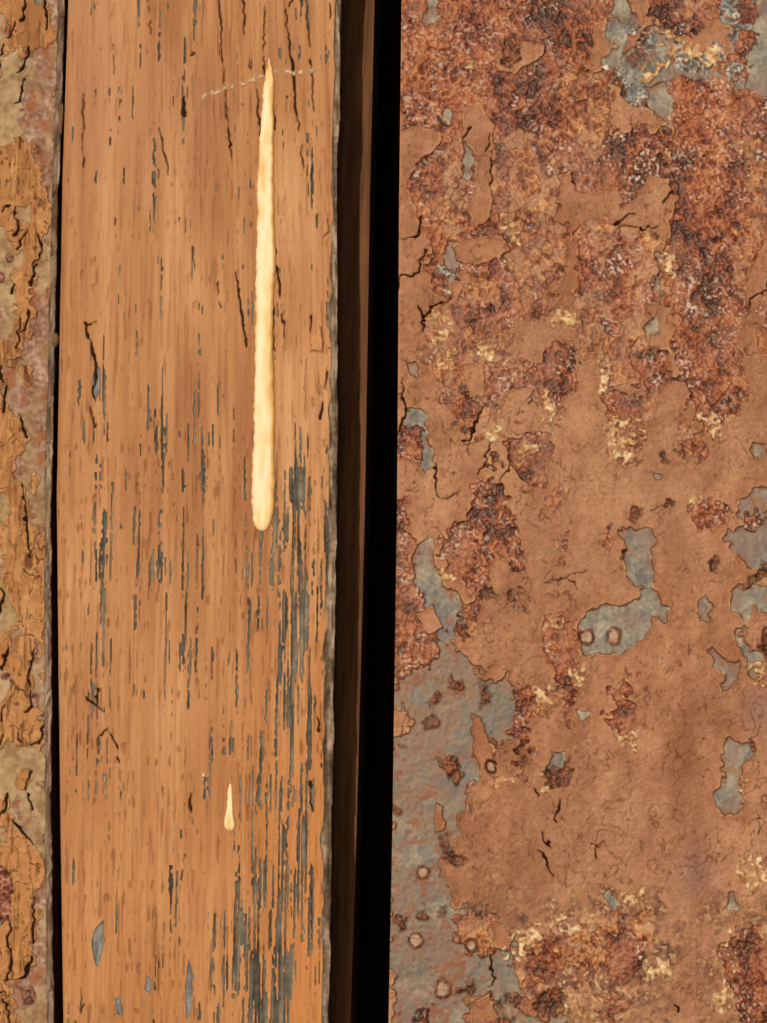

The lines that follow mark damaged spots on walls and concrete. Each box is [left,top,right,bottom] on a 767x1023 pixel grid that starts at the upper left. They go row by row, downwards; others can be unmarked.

crack [0,0,48,104]
peeling [173,0,197,144]
peeling [150,138,159,233]
peeling [77,342,109,444]
rust [395,0,767,796]
peeling [75,459,214,800]
peeling [578,526,672,657]
peeling [707,486,767,692]
peeling [389,535,572,1023]
peeling [169,865,180,946]
rust [451,885,684,1023]
rust [695,892,767,1023]